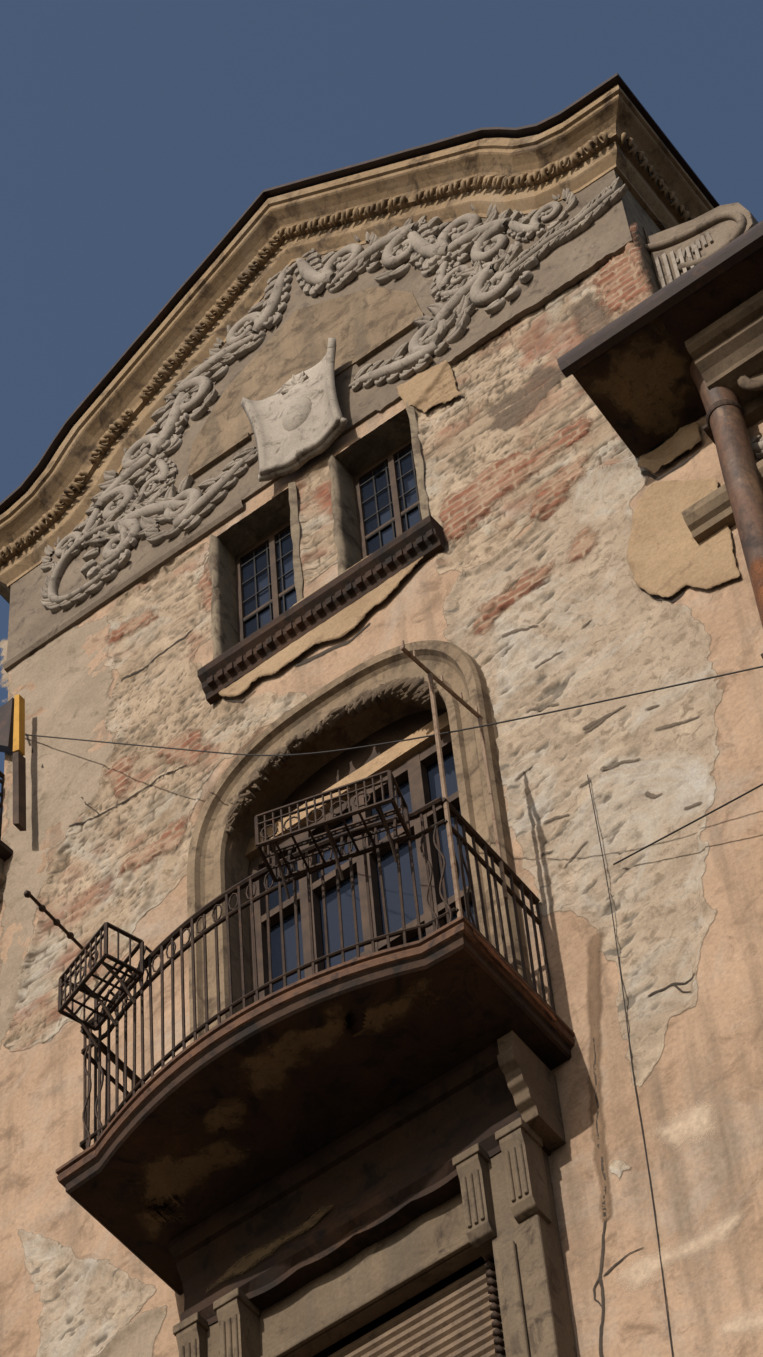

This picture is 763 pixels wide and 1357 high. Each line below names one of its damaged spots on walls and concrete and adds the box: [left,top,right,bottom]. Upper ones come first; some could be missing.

flaking render [3,225,740,1087]
crack [587,933,644,1357]
crack [648,973,695,997]